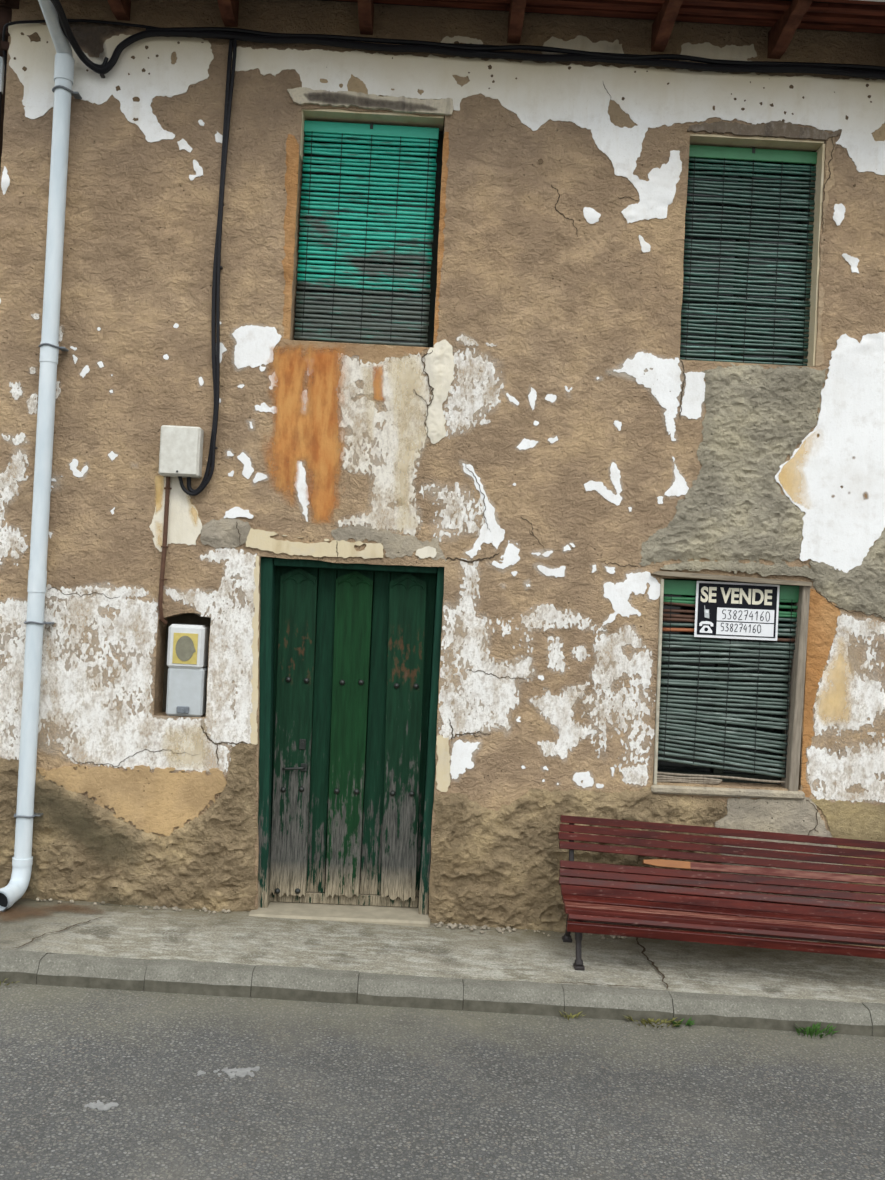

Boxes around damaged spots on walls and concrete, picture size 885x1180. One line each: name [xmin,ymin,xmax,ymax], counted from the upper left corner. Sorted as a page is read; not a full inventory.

flaking render [8,23,56,119]
flaking render [70,34,214,181]
flaking render [232,35,885,253]
flaking render [220,134,299,390]
flaking render [0,432,29,566]
rust [268,347,342,522]
flaking render [443,335,572,438]
flaking render [775,332,885,573]
flaking render [0,597,27,888]
flaking render [21,352,728,935]
flaking render [801,589,885,905]
crack [560,937,668,989]